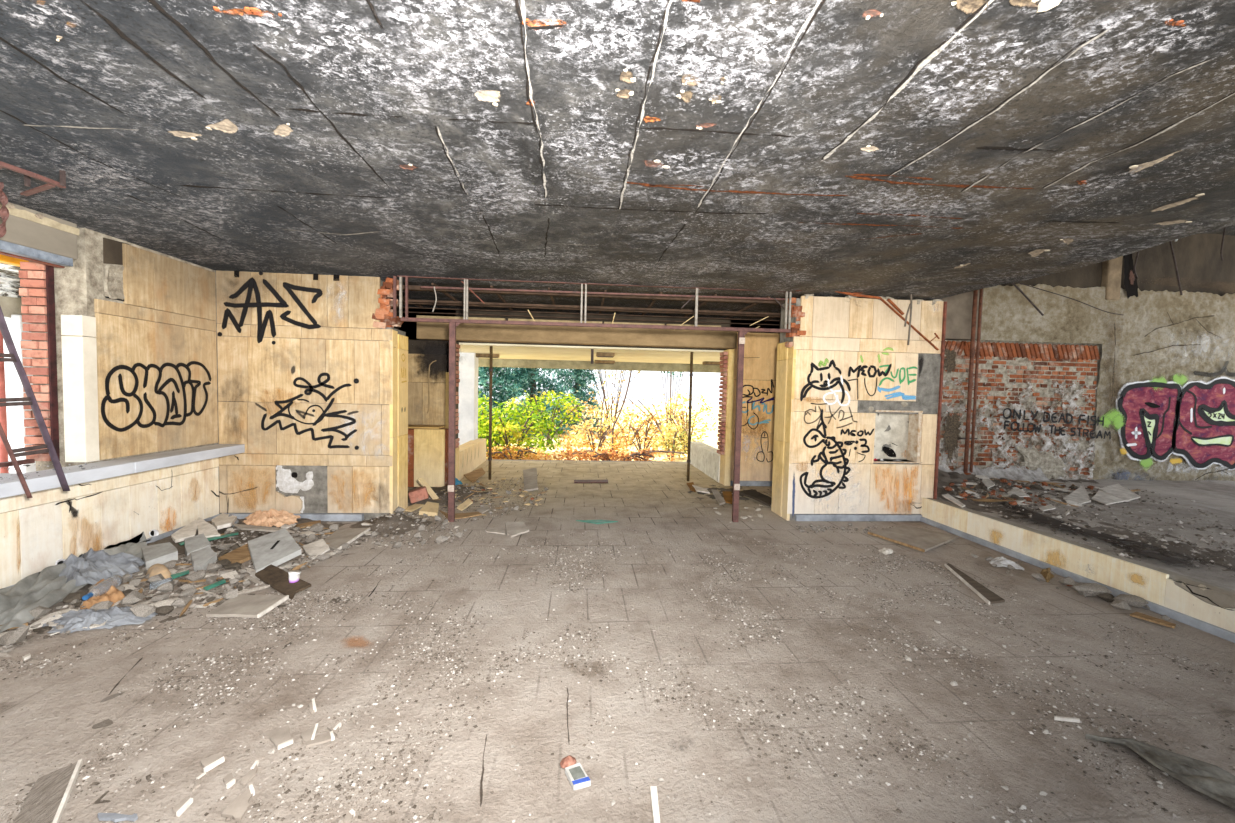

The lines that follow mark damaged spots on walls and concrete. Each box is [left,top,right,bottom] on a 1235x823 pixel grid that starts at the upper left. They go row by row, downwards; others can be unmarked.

peeling [863,9,883,20]
spalling [951,0,988,14]
spalling [521,18,567,30]
peeling [475,90,501,107]
spalling [1017,445,1067,479]
spalling [276,465,328,513]
crack [1173,580,1232,610]